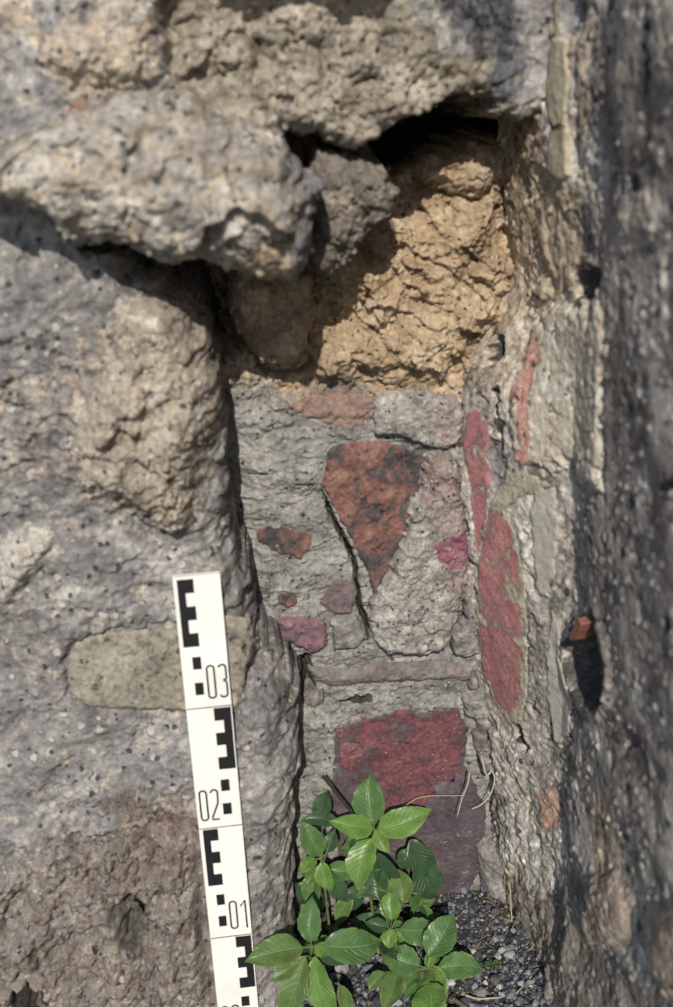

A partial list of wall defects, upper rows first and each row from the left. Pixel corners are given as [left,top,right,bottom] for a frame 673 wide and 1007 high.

crack [321,489,370,650]
flaking render [475,287,611,743]